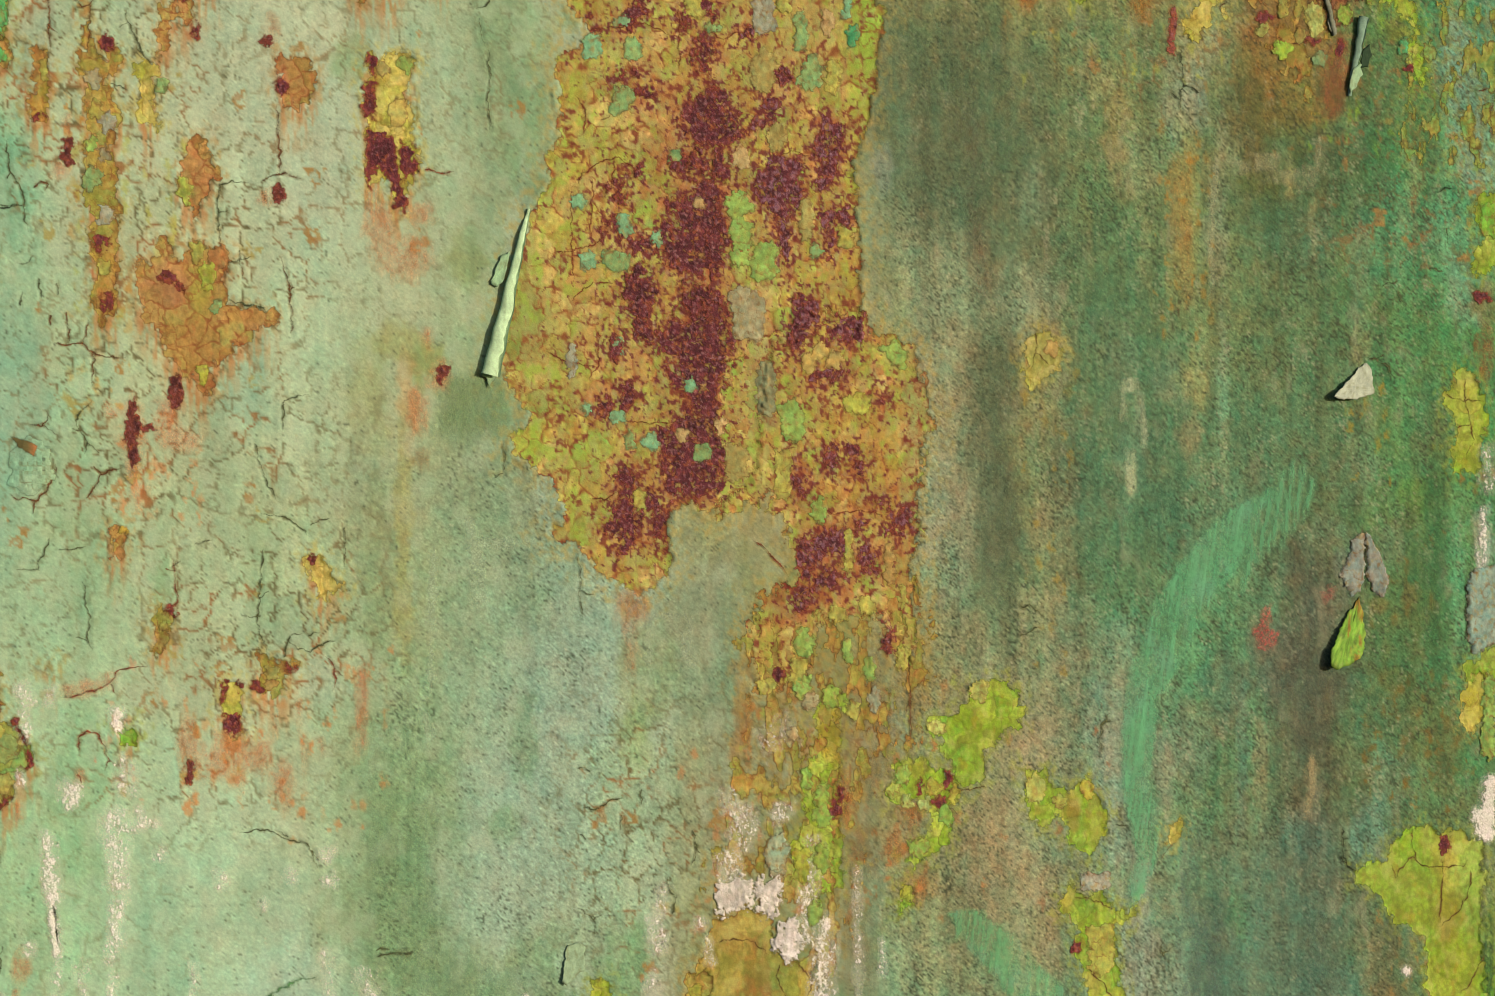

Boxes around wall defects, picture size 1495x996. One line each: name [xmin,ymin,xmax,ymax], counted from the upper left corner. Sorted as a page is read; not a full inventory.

crack [1,146,49,224]
peeling [75,0,281,396]
crack [217,110,297,331]
peeling [360,50,423,214]
crack [12,261,118,643]
crack [255,395,346,564]
peeling [502,0,1026,996]
crack [248,553,343,688]
peeling [0,700,34,810]
damp [716,794,756,880]
peeling [1024,766,1138,996]
peeling [1355,824,1489,996]